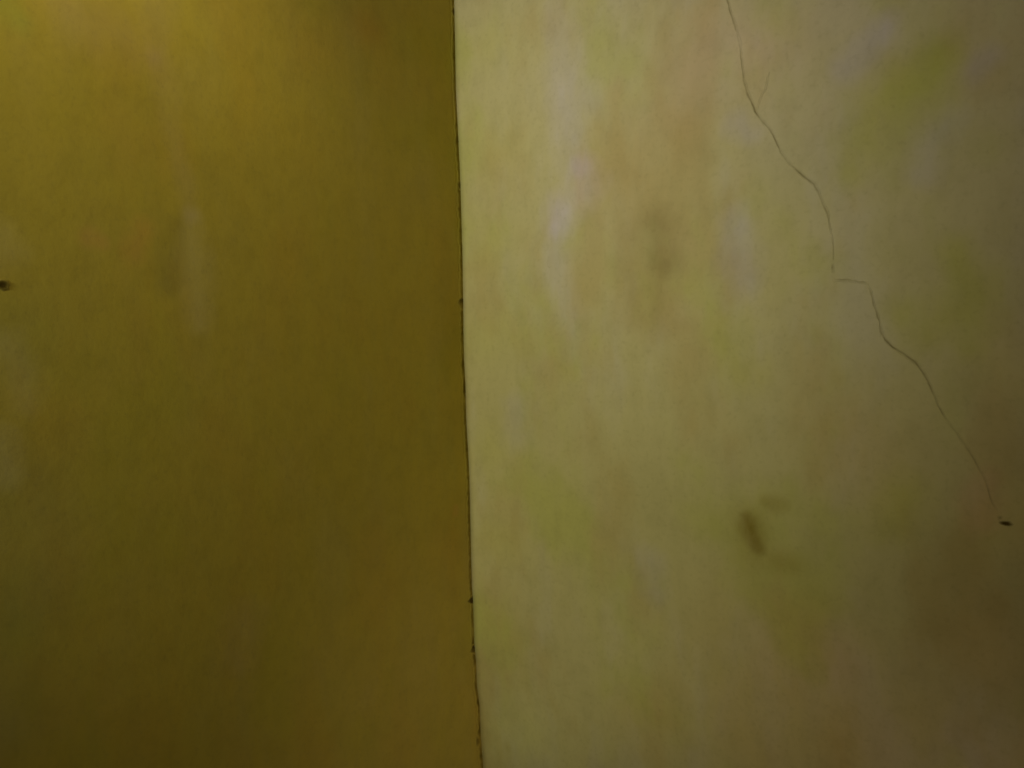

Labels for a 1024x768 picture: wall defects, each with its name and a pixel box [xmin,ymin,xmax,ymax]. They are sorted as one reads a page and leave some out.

crack [725,0,997,511]